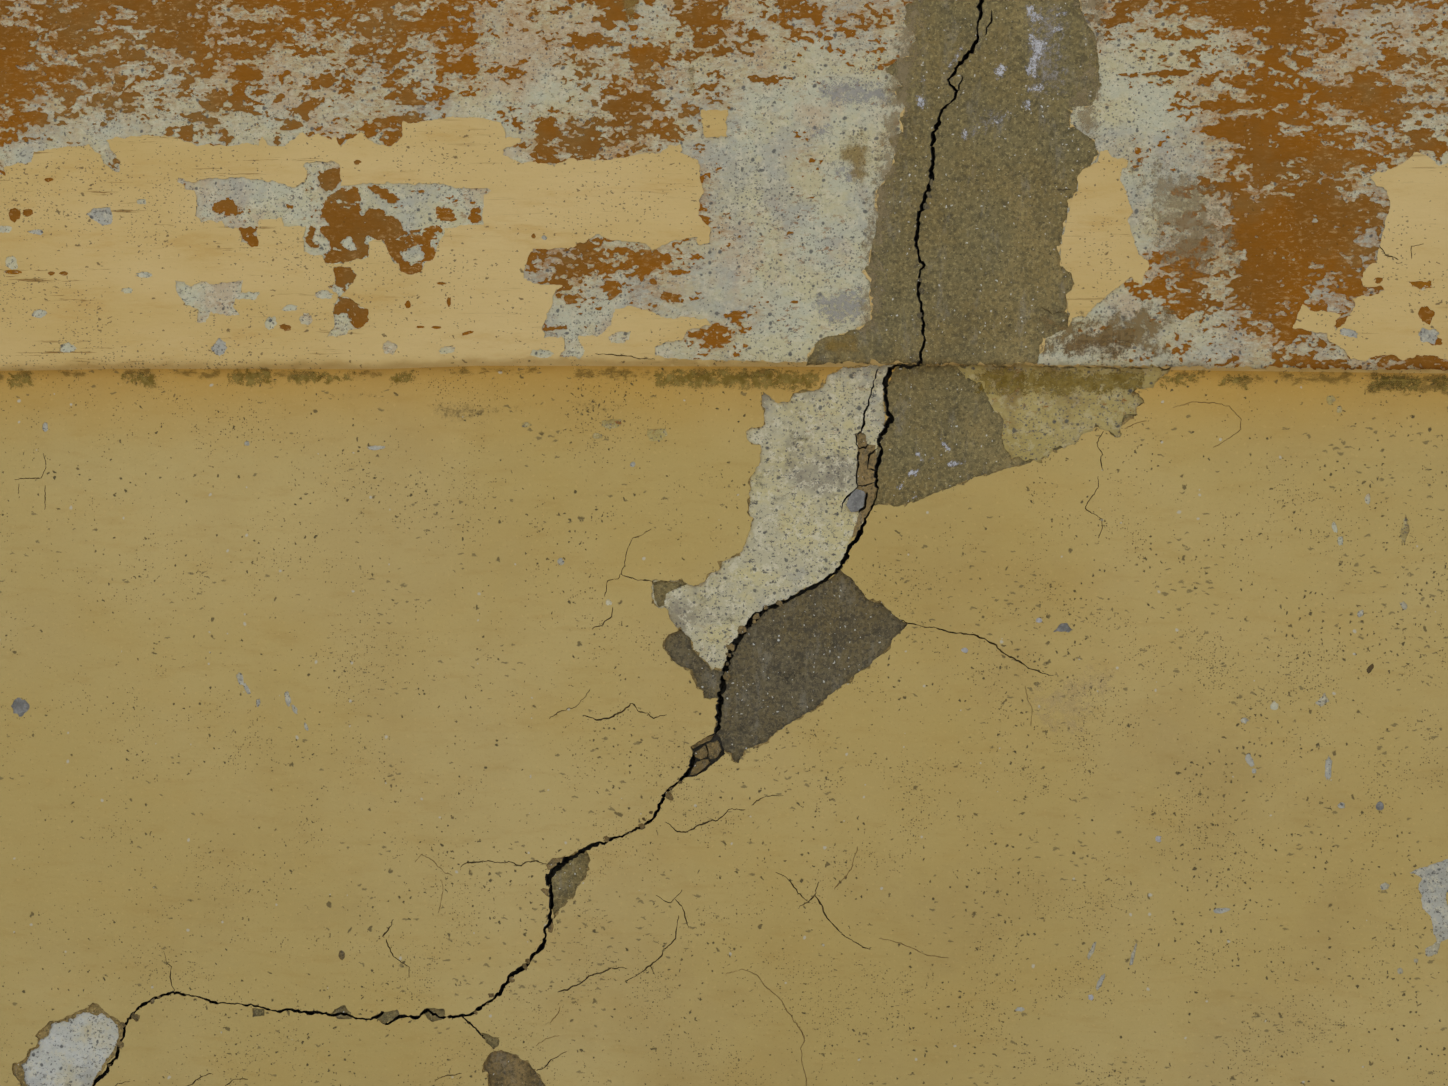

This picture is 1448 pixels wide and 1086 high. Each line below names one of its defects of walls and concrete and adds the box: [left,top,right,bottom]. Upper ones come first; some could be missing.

peeling [0,0,916,363]
crack [93,0,993,1086]
crack [898,618,1054,721]
peeling [651,0,1448,777]
flaking render [12,1003,123,1086]
flaking render [482,1033,546,1086]